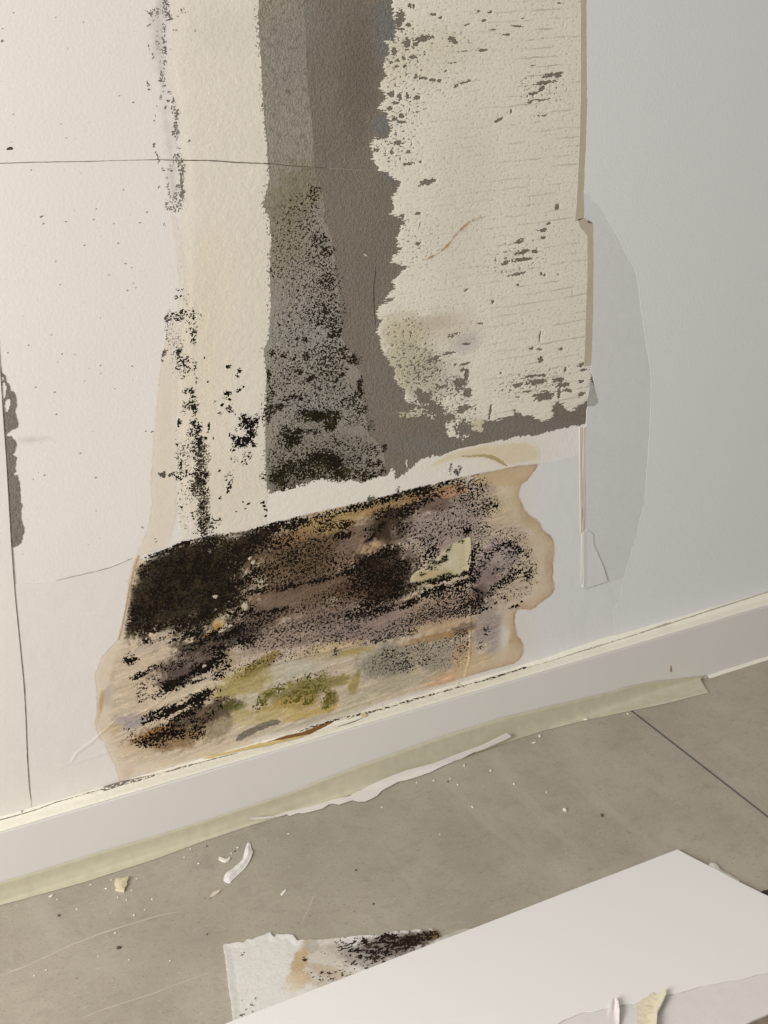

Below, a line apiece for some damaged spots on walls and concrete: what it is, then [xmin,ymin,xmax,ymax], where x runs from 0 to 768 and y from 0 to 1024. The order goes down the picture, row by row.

water stain [94,183,556,782]
peeling [254,0,594,494]